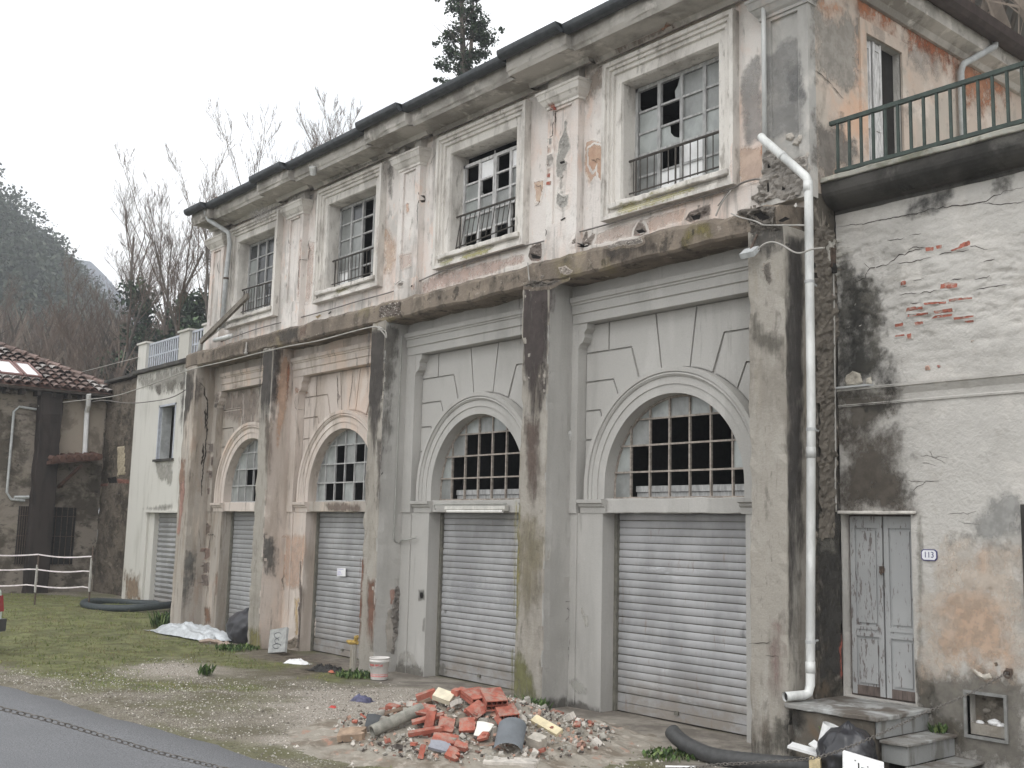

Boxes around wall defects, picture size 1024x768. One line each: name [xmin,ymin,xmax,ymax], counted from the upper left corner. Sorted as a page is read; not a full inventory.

rust [908,29,1006,107]
peeling [379,239,544,318]
peeling [532,107,601,221]
peeling [568,200,714,251]
spalling [729,132,811,234]
crack [840,187,1023,315]
flaking render [893,280,976,341]
crack [199,382,208,496]
water stain [215,327,302,470]
water stain [367,326,399,501]
water stain [815,260,912,681]
water stain [263,535,283,584]